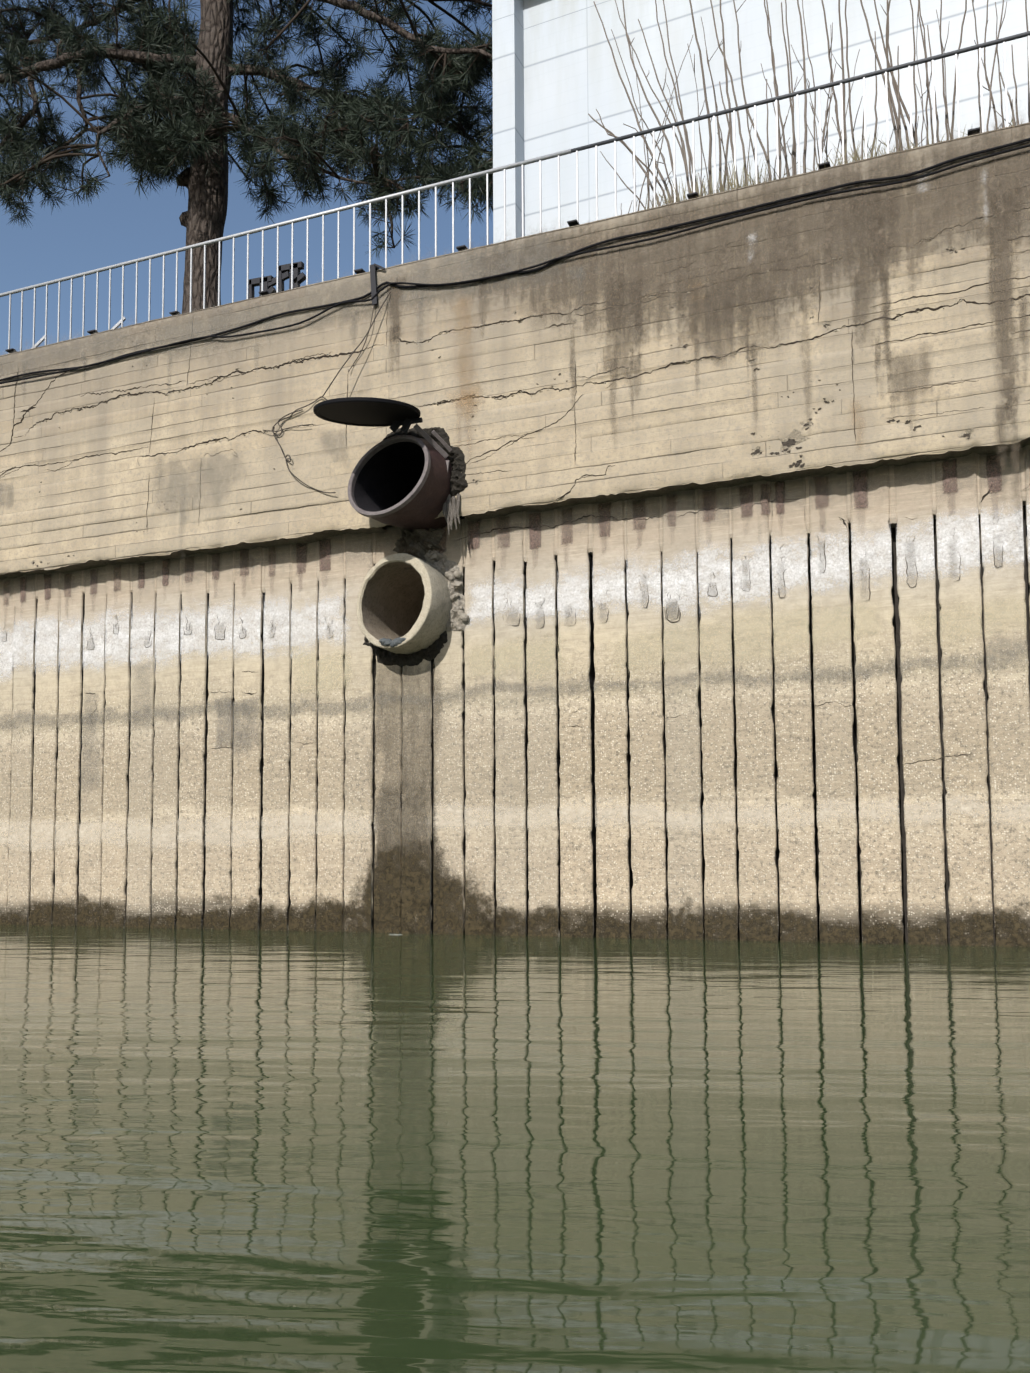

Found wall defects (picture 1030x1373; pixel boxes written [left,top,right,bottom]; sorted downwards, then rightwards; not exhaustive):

crack [0,261,705,527]
crack [420,185,1030,540]
water stain [470,131,1030,417]
water stain [468,510,1030,621]